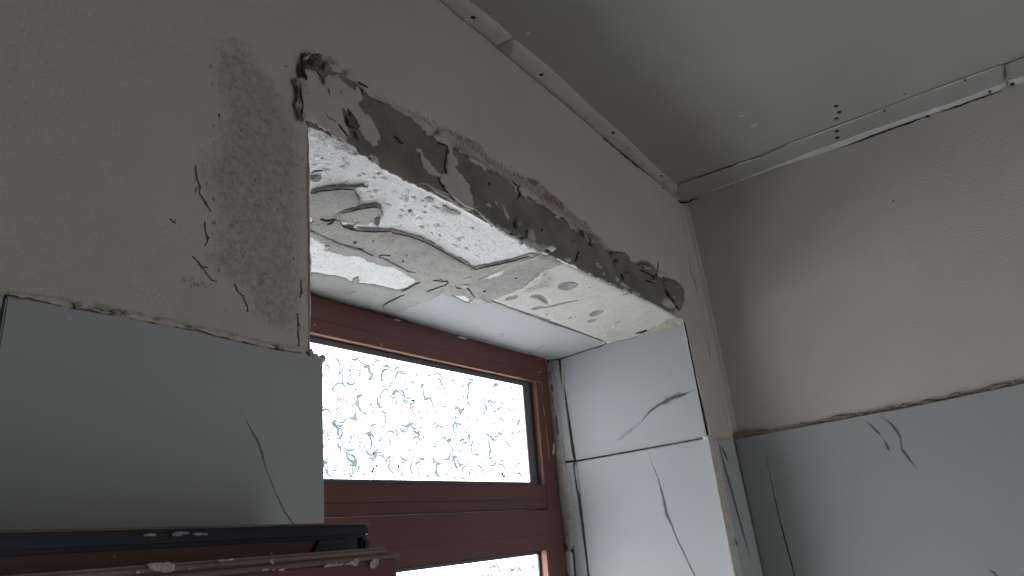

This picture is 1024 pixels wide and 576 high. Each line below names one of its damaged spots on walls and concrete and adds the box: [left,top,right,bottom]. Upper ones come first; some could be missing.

crack [192,165,249,312]
peeling [284,52,685,349]